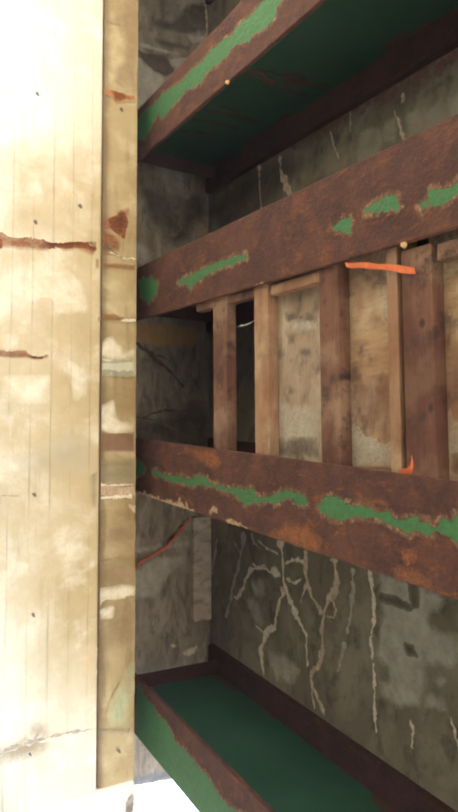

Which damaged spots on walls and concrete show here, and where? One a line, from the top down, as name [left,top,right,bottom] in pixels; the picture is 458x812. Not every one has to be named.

peeling [137,0,288,144]
corrosion [288,48,458,153]
peeling [328,173,458,238]
corrosion [0,206,136,271]
peeling [137,274,179,316]
corrosion [0,349,49,361]
water stain [446,348,458,481]
peeling [101,456,458,551]
corrosion [264,520,324,553]
water stain [377,583,420,612]
water stain [266,649,302,686]
water stain [403,642,418,658]